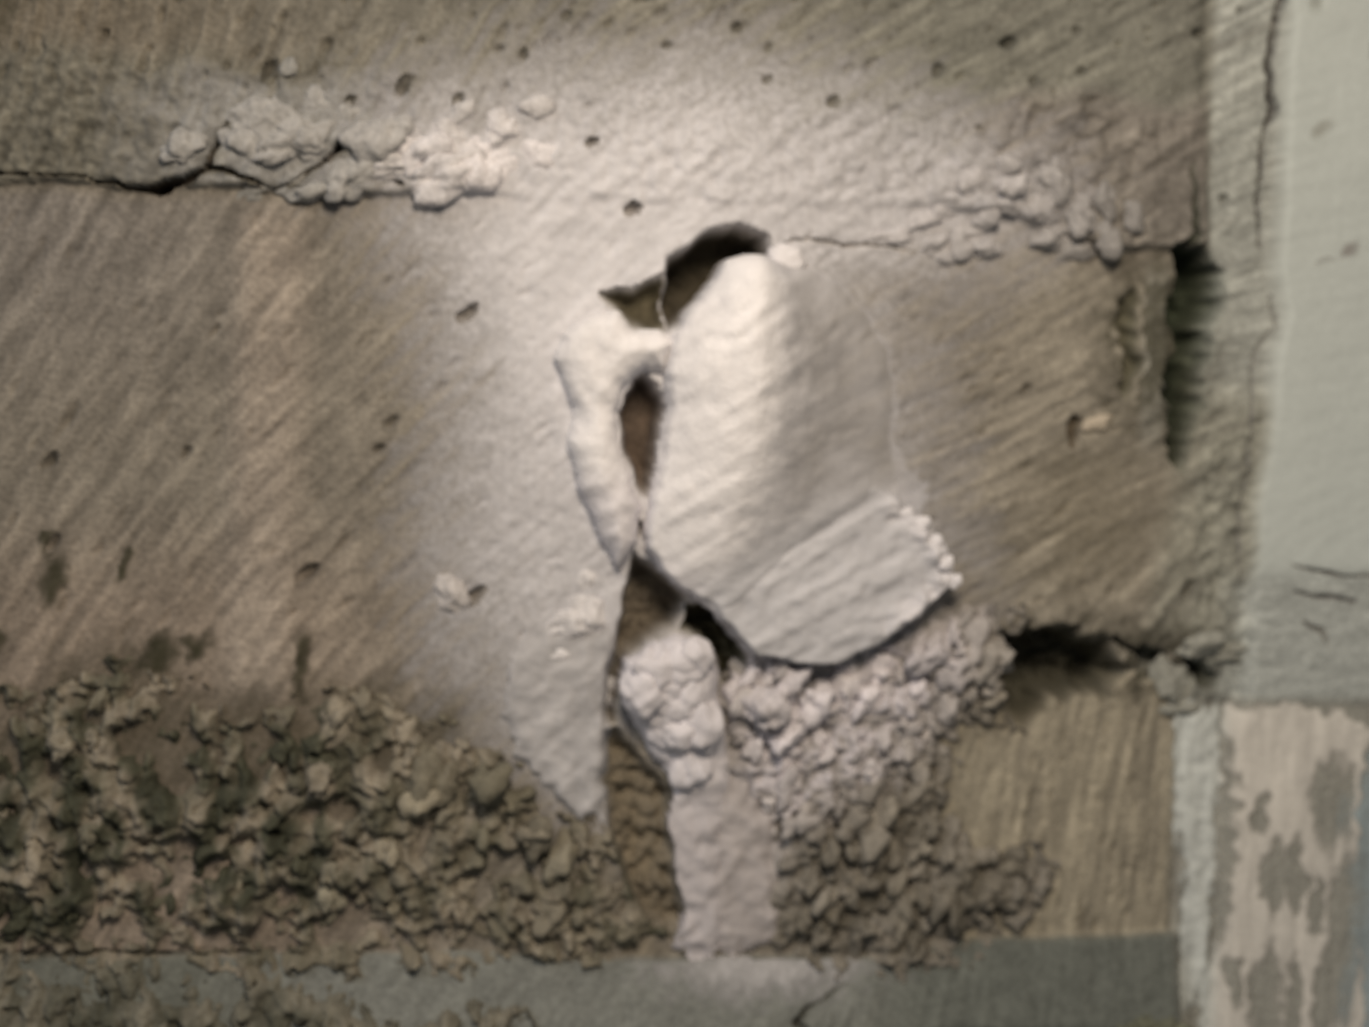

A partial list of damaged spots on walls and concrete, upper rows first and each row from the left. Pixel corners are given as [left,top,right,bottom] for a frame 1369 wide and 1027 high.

crack [0,120,349,198]
crack [393,180,406,188]
crack [1254,0,1289,253]
water stain [381,52,1043,996]
crack [1235,294,1282,582]
spalling [0,654,688,1027]
spalling [707,486,1369,1027]